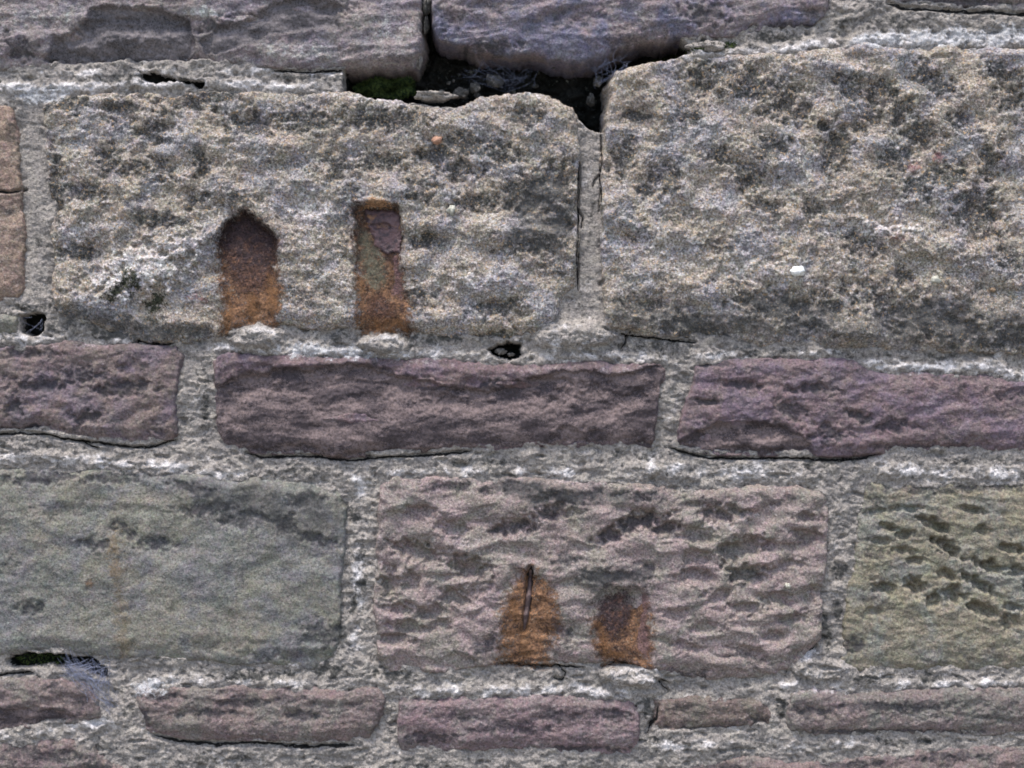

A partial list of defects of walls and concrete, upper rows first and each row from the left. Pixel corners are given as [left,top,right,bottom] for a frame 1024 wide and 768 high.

rust [213,206,290,335]
rust [349,197,417,336]
crack [576,134,603,289]
rust [494,564,564,669]
rust [588,588,657,670]